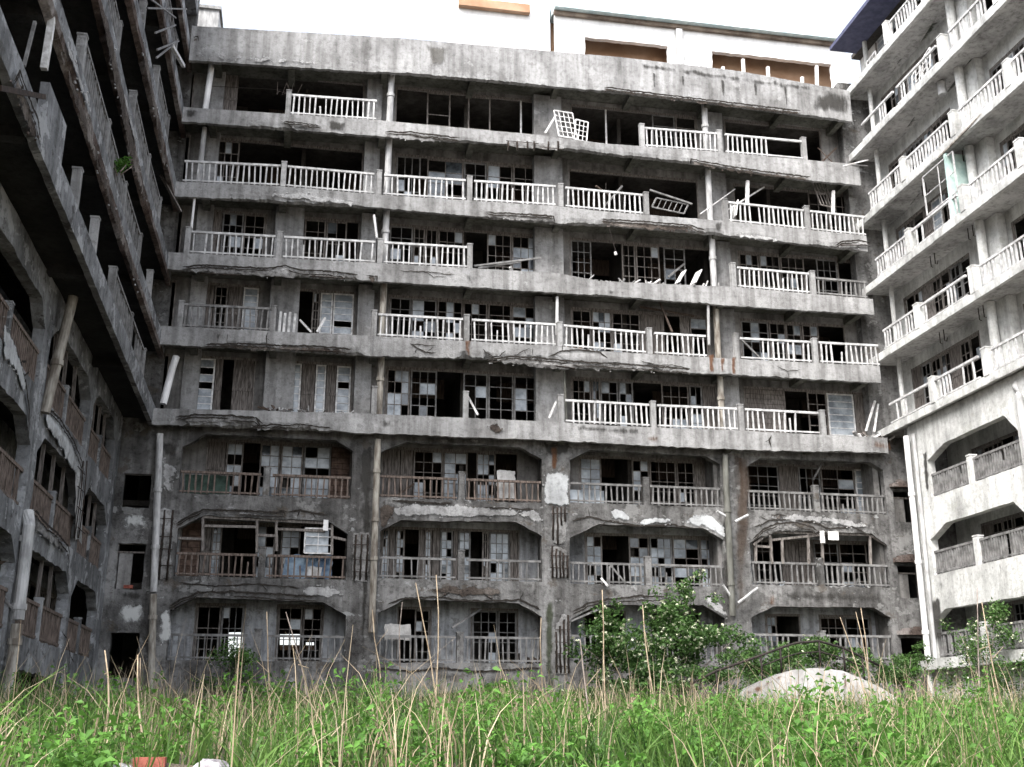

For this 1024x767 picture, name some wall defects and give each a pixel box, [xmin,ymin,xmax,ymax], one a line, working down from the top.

flaking render [3,316,26,391]
corrosion [709,355,736,373]
flaking render [380,470,569,578]
flaking render [611,509,725,537]